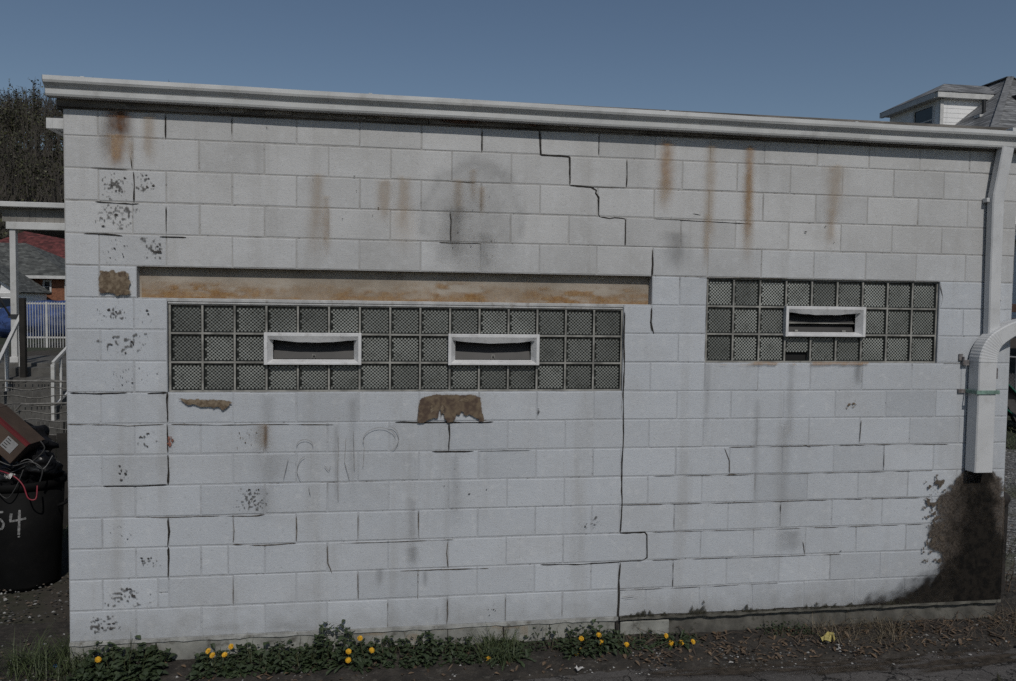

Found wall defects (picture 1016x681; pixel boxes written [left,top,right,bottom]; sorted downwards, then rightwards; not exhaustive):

crack [539,131,628,245]
peeling [95,173,155,258]
spalling [98,270,131,296]
rust [144,286,259,298]
rust [339,285,485,302]
rust [544,291,648,305]
peeling [180,398,232,410]
peeling [417,394,484,423]
crack [541,313,918,635]
crack [771,429,944,474]
crack [356,511,488,571]
leakage [865,470,1006,605]